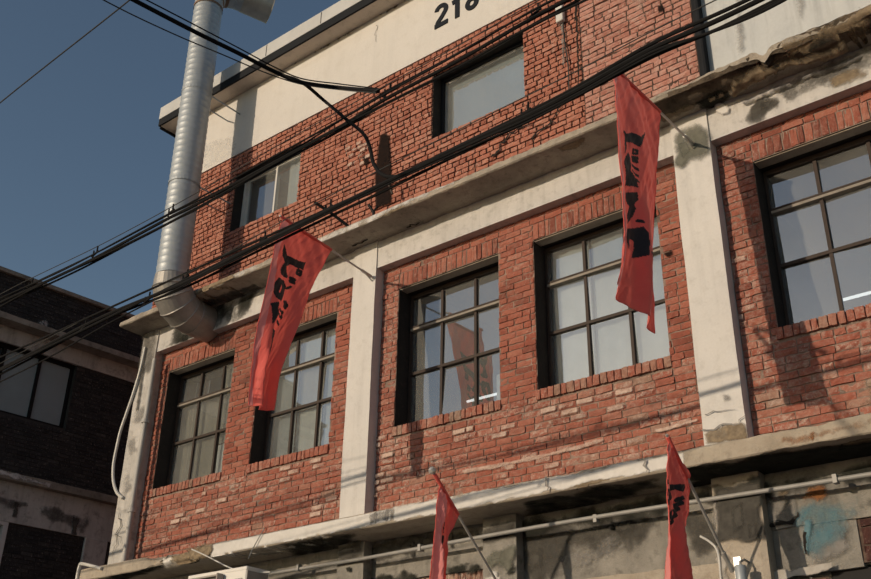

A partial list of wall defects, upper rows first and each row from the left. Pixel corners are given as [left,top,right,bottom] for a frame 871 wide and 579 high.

spalling [697,4,871,109]
leakage [784,45,871,98]
peeling [747,97,778,123]
crack [702,409,745,432]
leakage [0,497,26,517]
leakage [44,507,88,535]
leakage [686,441,871,554]
mould [376,570,416,579]